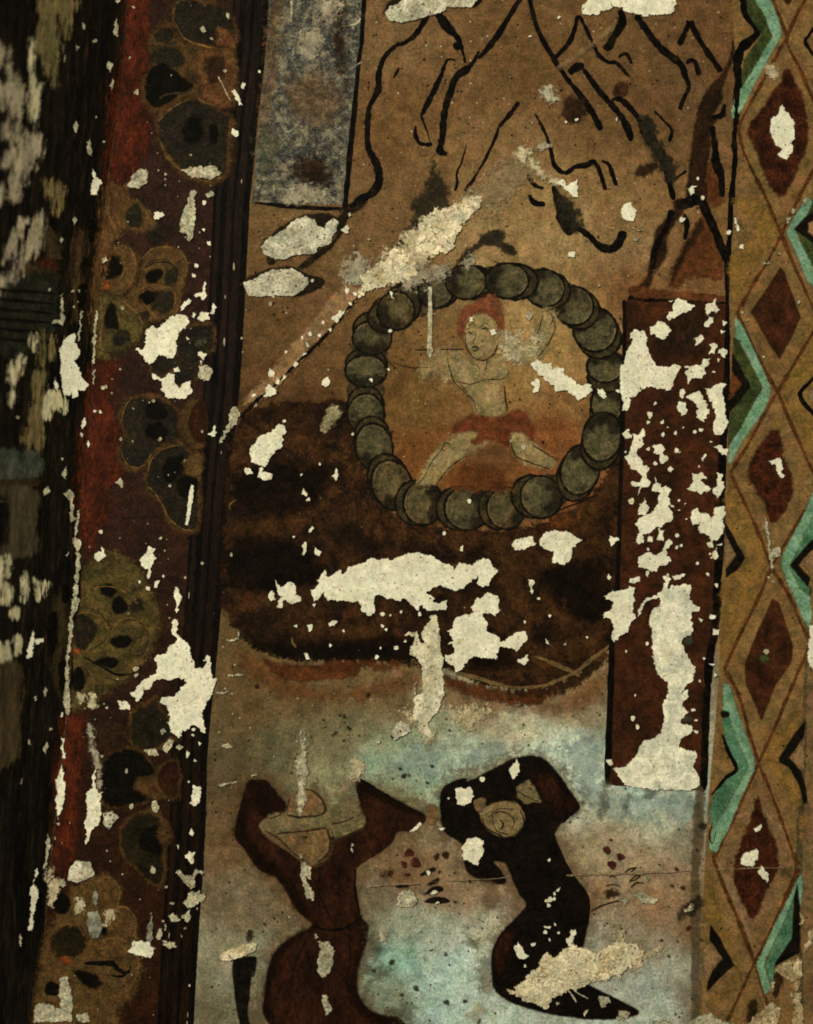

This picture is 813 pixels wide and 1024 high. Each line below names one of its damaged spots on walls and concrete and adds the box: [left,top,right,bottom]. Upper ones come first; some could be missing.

peeling [243,213,351,307]
peeling [375,215,430,265]
peeling [49,288,89,398]
peeling [136,264,217,403]
peeling [244,420,286,481]
peeling [490,298,729,791]
peeling [105,576,217,762]
peeling [268,545,529,737]
peeling [514,923,576,967]
peeling [583,996,630,1020]